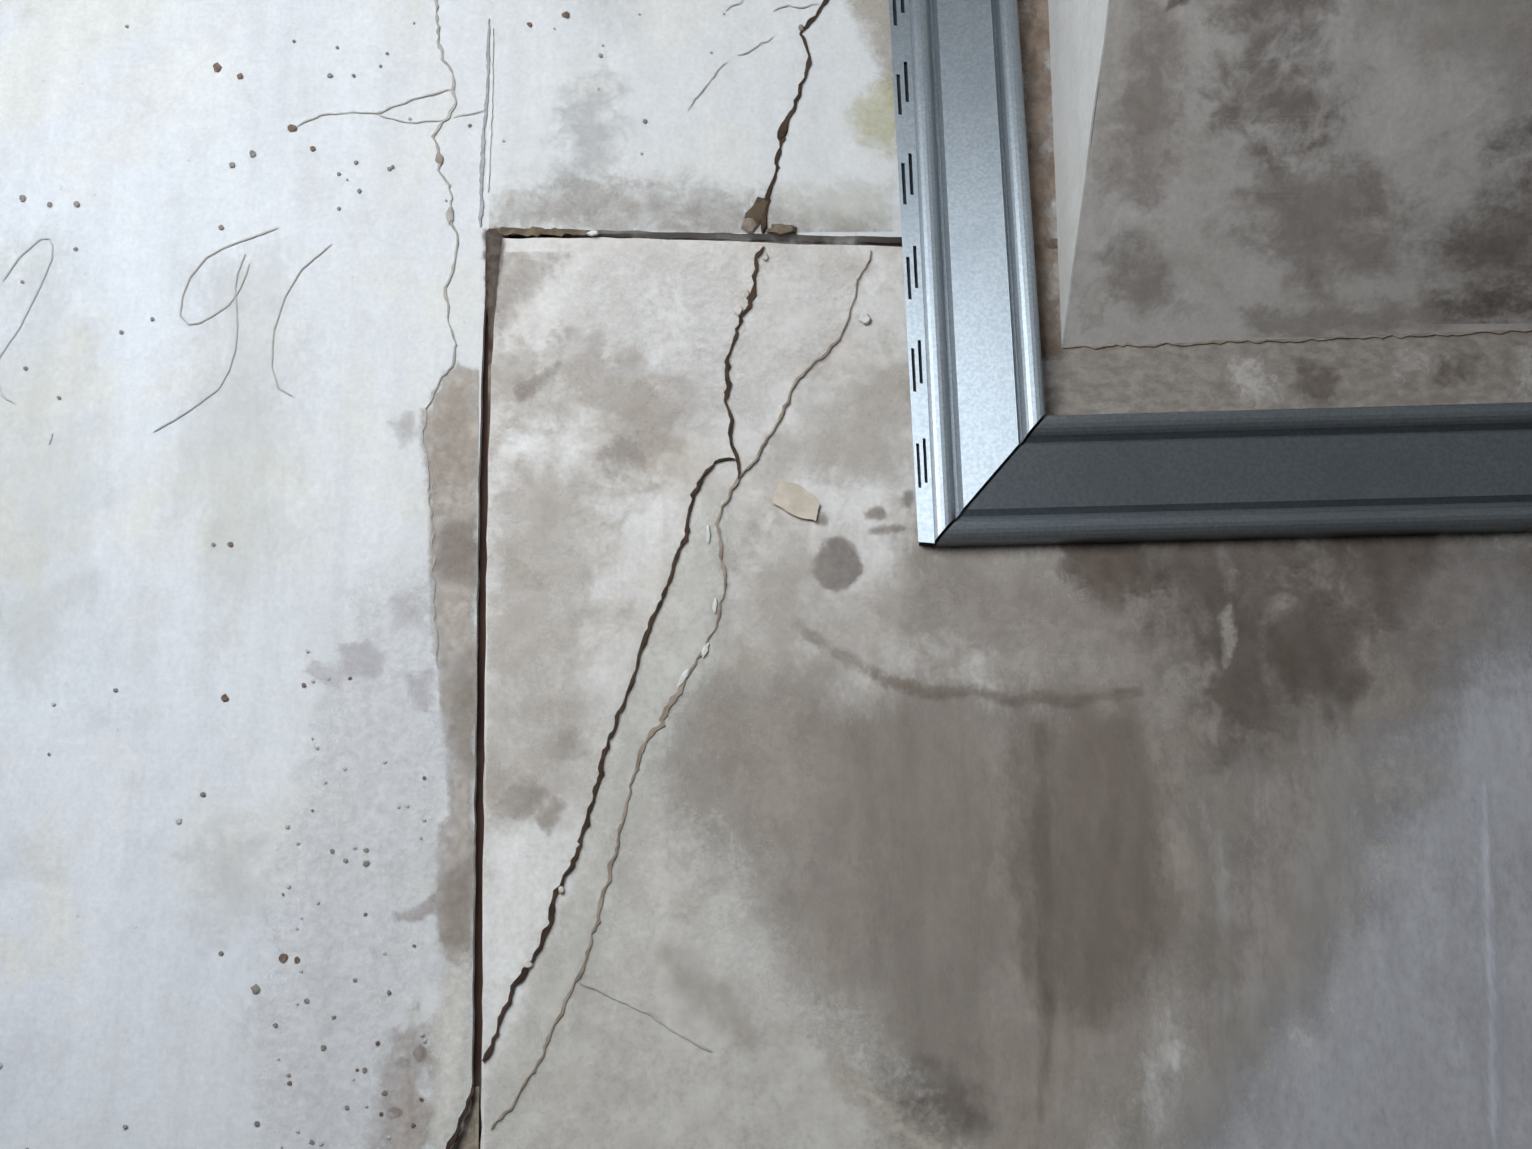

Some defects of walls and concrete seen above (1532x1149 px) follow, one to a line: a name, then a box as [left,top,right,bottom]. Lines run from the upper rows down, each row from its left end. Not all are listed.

crack [297,0,494,666]
damp [427,952,472,1147]
crack [482,0,871,1129]
damp [484,475,1532,1149]
damp [1017,0,1532,415]